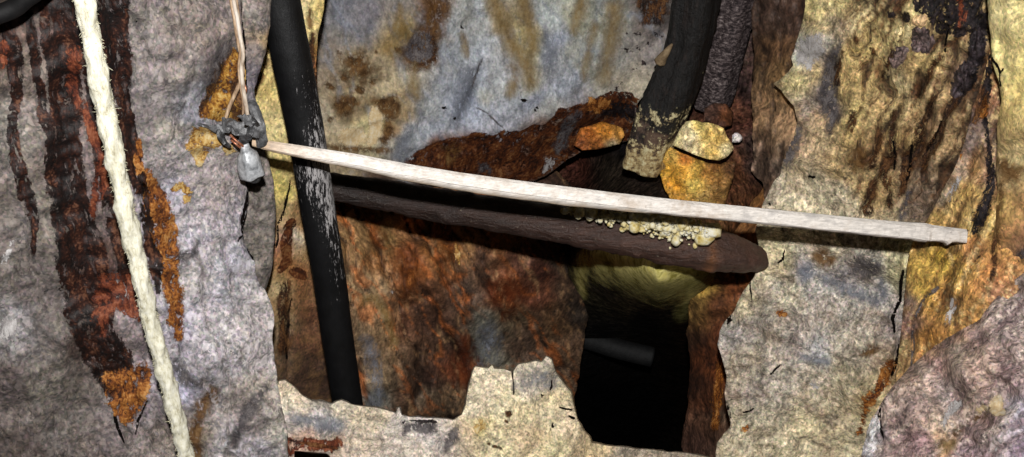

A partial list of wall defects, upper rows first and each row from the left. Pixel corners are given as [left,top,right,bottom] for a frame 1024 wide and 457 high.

corrosion [0,0,152,426]
corrosion [96,0,185,341]
corrosion [404,91,639,181]
crack [891,270,939,376]
corrosion [855,359,897,436]